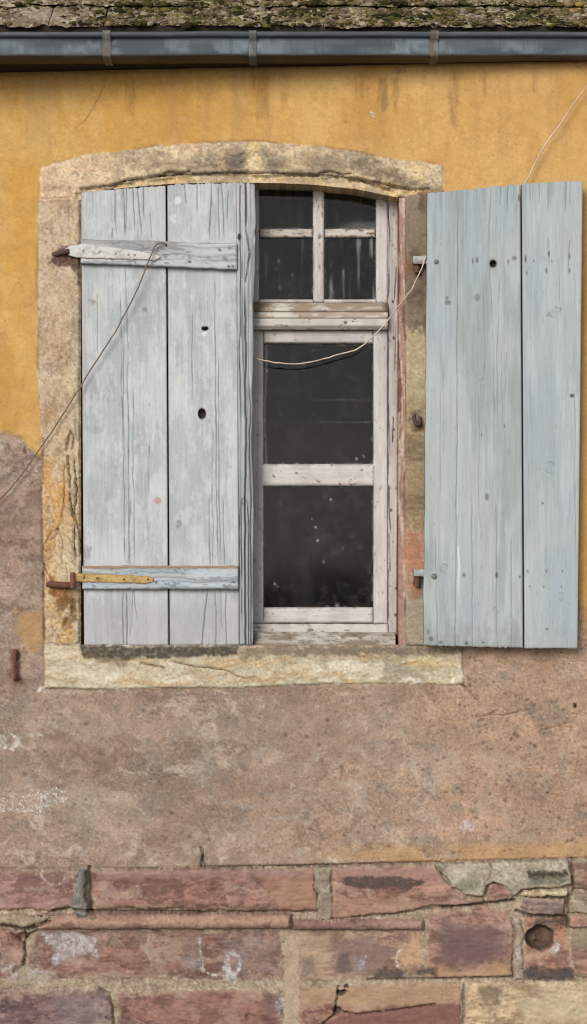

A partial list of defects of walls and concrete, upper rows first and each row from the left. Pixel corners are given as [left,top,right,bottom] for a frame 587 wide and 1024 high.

flaking render [0,433,587,896]
damp [42,931,98,964]